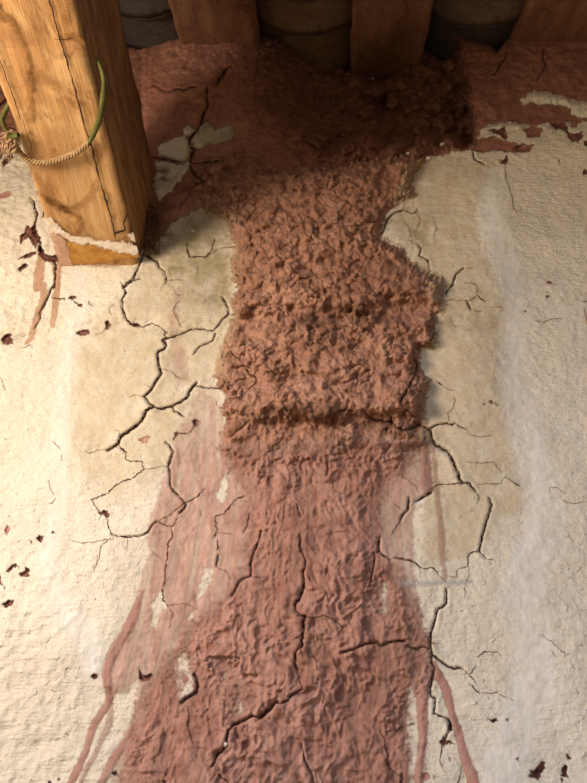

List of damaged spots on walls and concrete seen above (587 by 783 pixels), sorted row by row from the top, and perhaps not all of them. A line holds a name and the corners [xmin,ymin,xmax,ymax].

crack [49,0,128,238]
crack [150,66,247,210]
spalling [552,122,587,146]
spalling [18,225,58,272]
water stain [25,254,61,344]
crack [446,267,503,327]
crack [17,198,289,628]
spalling [0,564,30,589]
crack [326,357,520,783]
crack [211,536,342,783]
crack [182,675,200,742]
spalling [529,761,545,780]